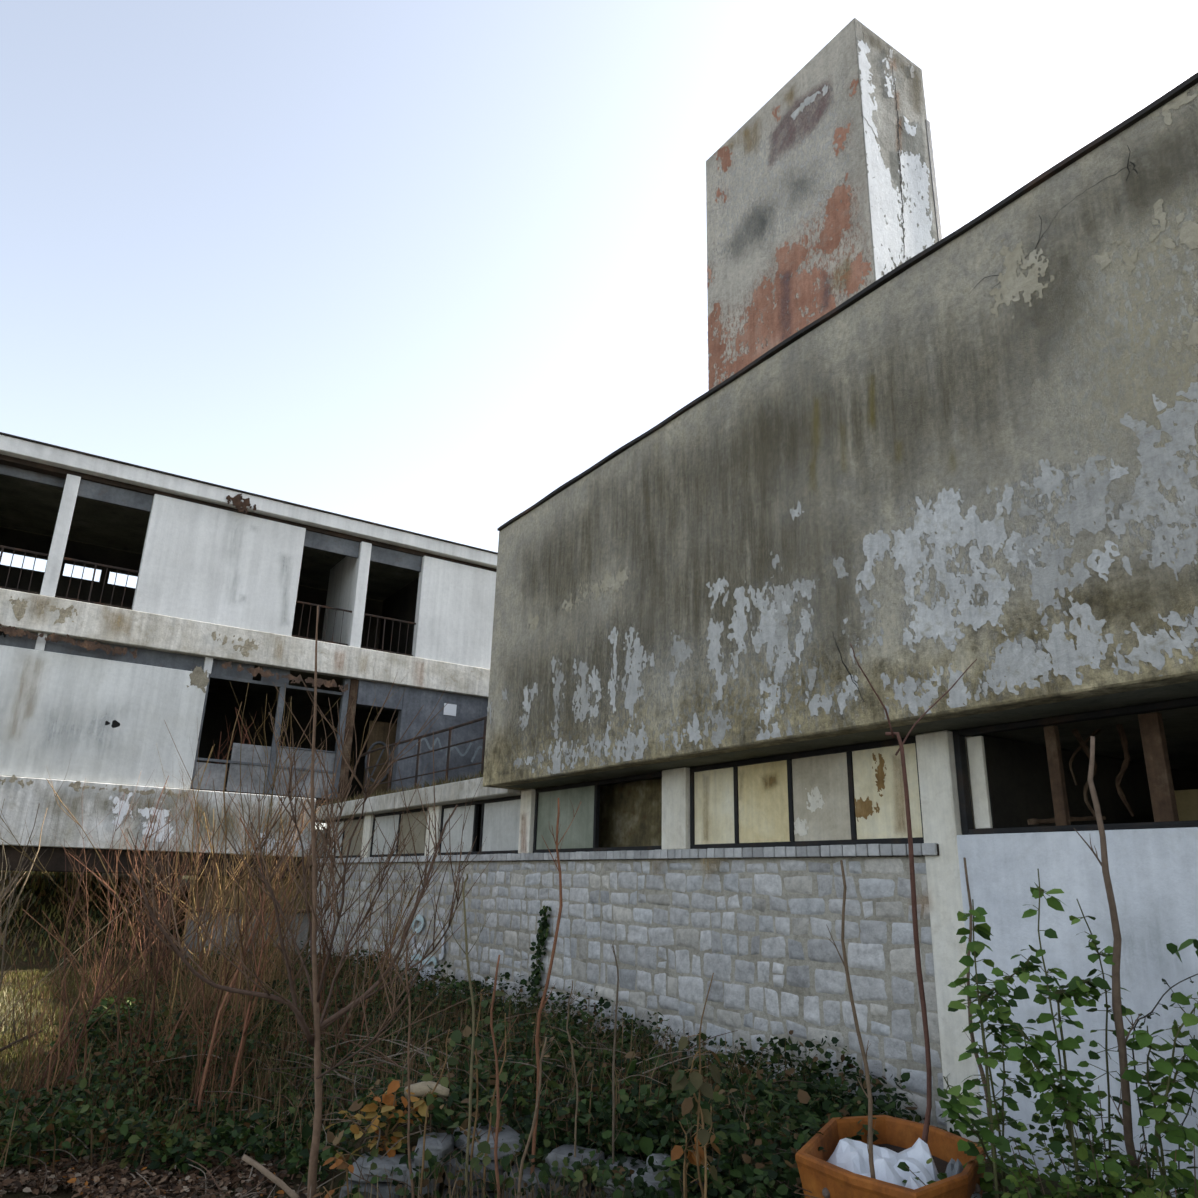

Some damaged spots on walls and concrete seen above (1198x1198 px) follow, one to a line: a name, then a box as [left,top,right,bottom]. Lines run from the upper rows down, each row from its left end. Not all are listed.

flaking render [1155,88,1198,125]
flaking render [708,40,935,390]
crack [969,145,1138,294]
flaking render [1093,199,1198,275]
flaking render [989,238,1054,319]
damp [825,353,990,455]
peeling [487,382,1198,774]
spalling [0,775,34,788]
peeling [69,781,188,843]
peeling [253,833,310,853]